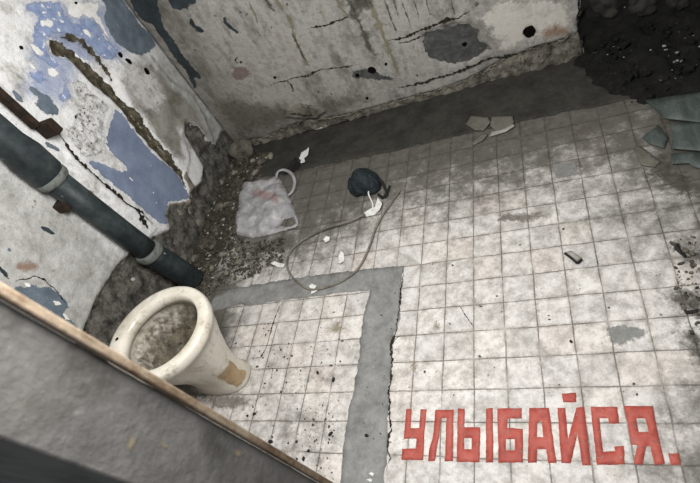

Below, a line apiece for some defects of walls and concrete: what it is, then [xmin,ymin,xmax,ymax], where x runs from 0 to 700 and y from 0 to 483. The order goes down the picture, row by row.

crack [270,65,352,90]
crack [310,16,350,28]
crack [392,11,470,43]
flaking render [249,0,700,146]
peeling [26,0,234,264]
crack [60,135,153,228]
flaking render [14,253,180,347]
crack [386,270,404,470]
leakage [607,325,645,345]